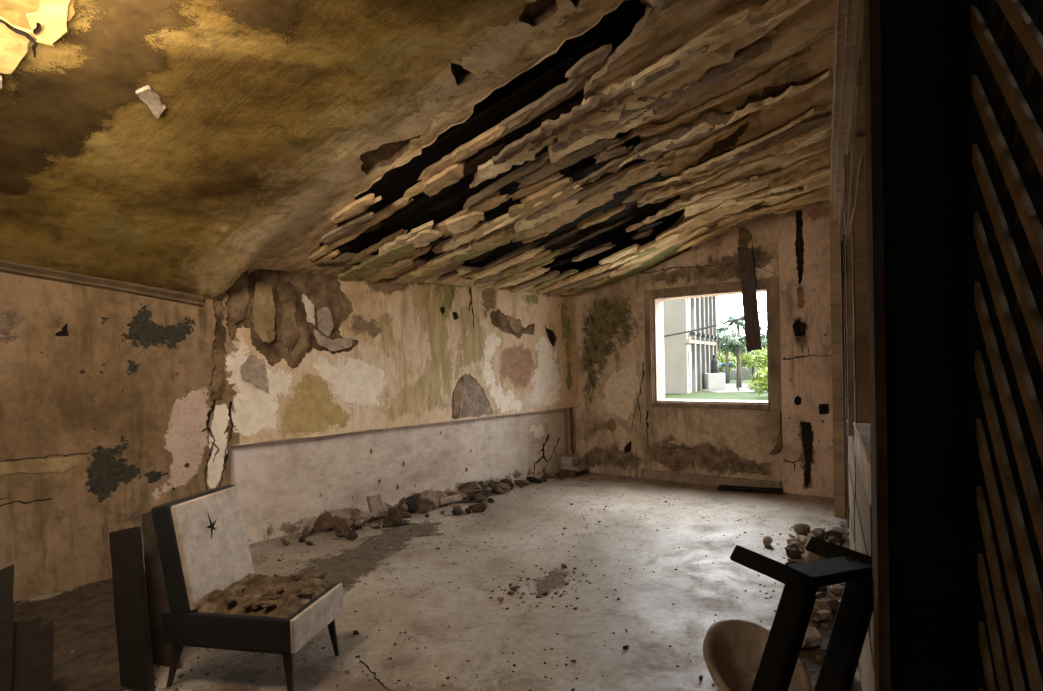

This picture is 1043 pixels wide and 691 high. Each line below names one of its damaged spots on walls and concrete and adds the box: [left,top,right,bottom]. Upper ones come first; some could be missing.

flaking render [0,0,75,89]
spalling [360,135,420,175]
flaking render [470,0,832,252]
damp [685,81,798,170]
spalling [152,267,392,501]
flaking render [451,309,562,440]
damp [579,293,641,411]
crack [0,450,117,462]
crack [202,399,233,490]
damp [582,418,775,478]
crack [0,498,52,507]
crack [360,661,393,691]